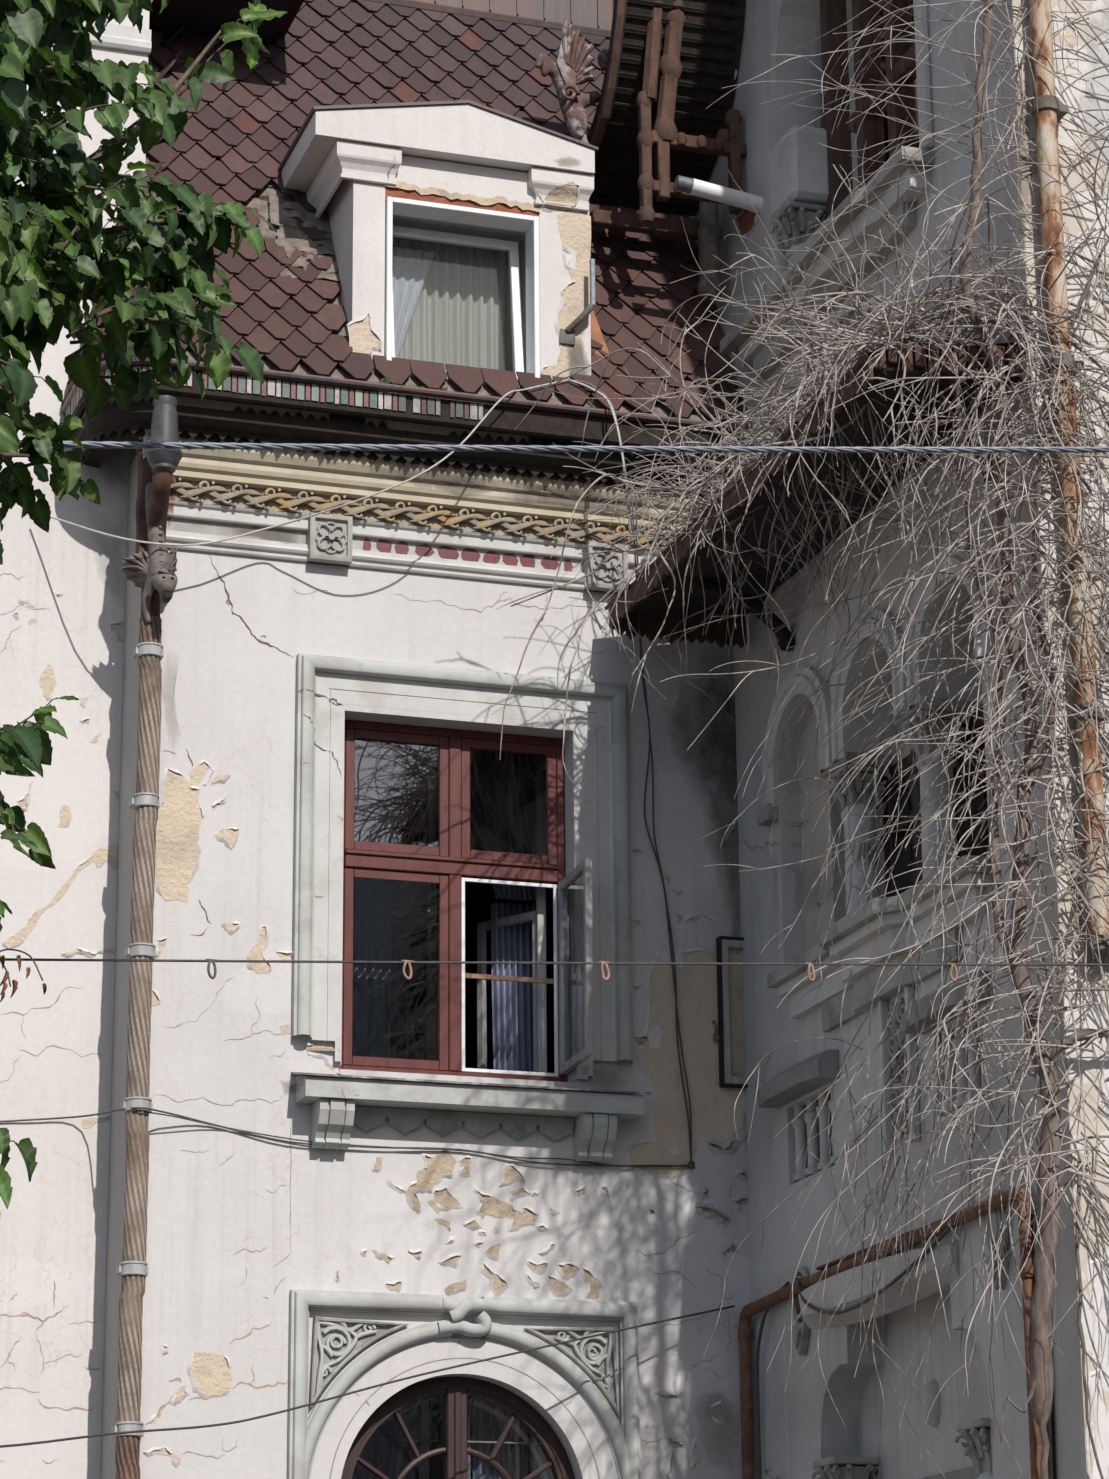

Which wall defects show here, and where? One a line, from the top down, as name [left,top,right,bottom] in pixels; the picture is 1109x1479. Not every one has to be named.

peeling [385,181,591,388]
crack [210,556,342,773]
crack [397,593,671,694]
damp [683,681,738,806]
peeling [2,845,118,949]
peeling [155,760,241,902]
peeling [246,925,294,974]
crack [0,986,103,1083]
peeling [625,946,748,1224]
crack [145,1095,291,1425]
peeling [360,1150,602,1299]
crack [0,1281,101,1411]